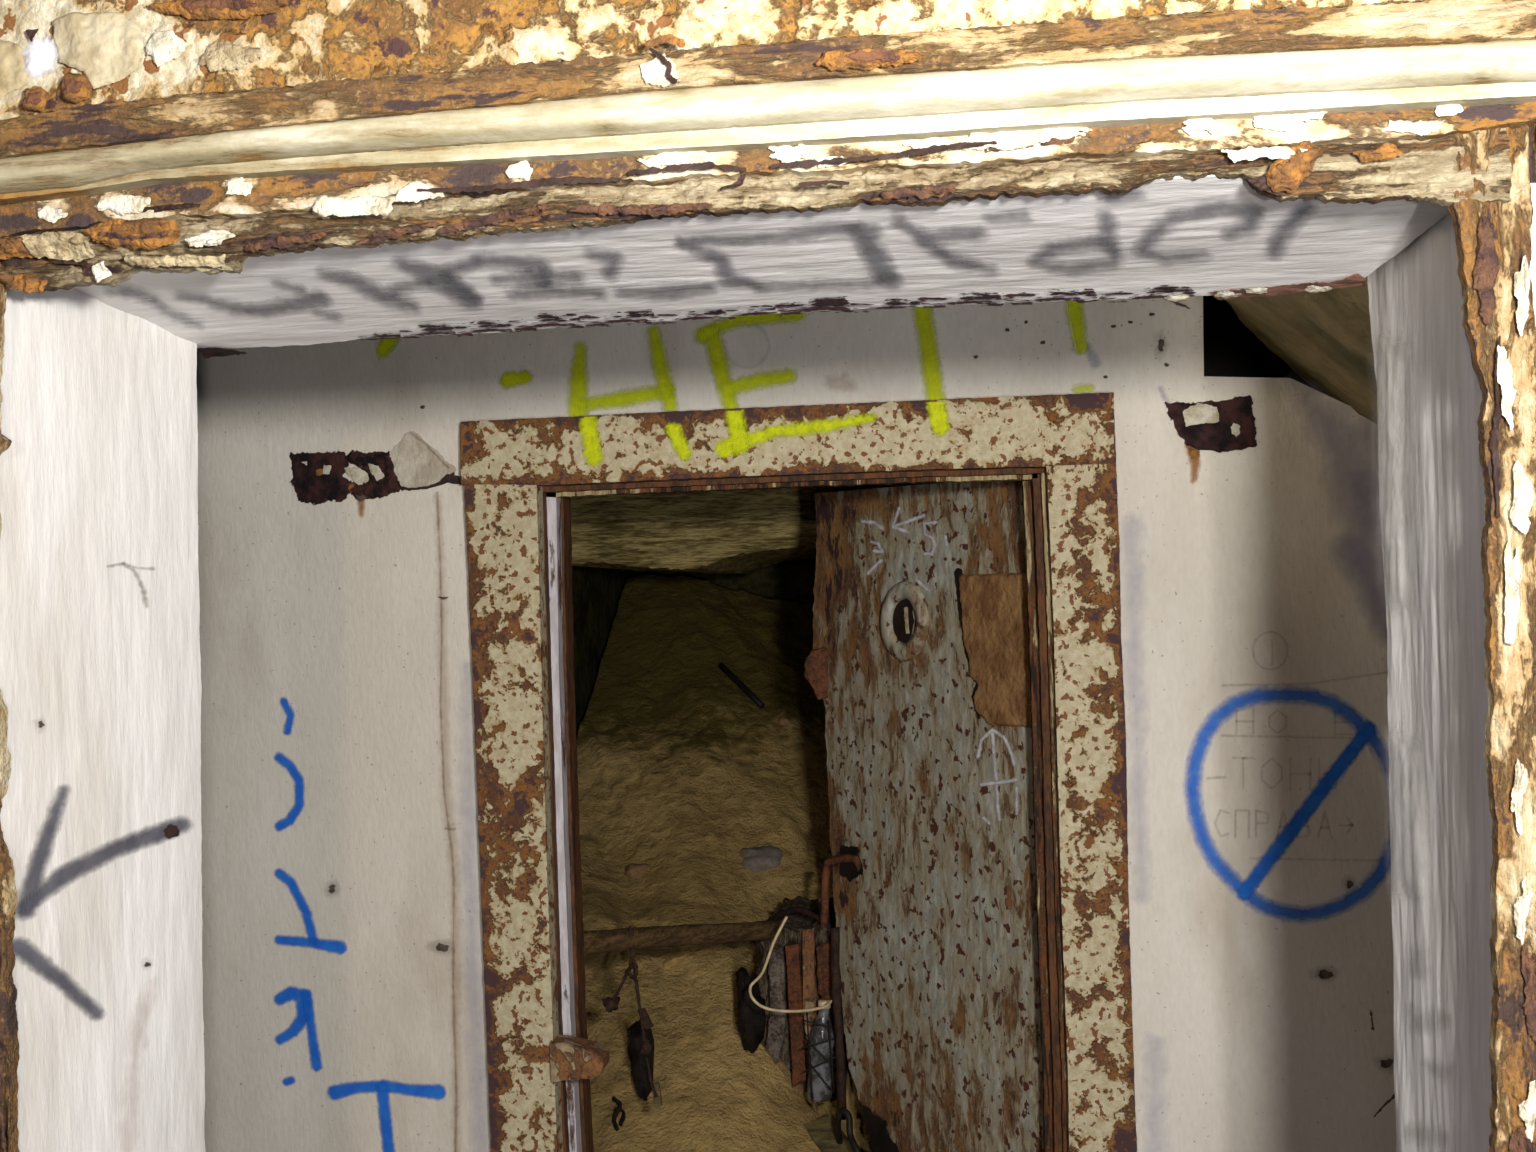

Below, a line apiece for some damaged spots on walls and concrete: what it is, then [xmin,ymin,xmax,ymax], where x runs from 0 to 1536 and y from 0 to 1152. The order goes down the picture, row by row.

corrosion [145,0,288,20]
peeling [0,12,262,100]
corrosion [815,48,923,71]
corrosion [21,72,93,112]
peeling [903,127,1092,151]
peeling [312,181,444,217]
peeling [21,204,236,282]
corrosion [1473,214,1500,325]
peeling [1497,345,1517,430]
peeling [1504,460,1534,645]
corrosion [1509,1127,1534,1152]
peeling [1519,1080,1536,1142]